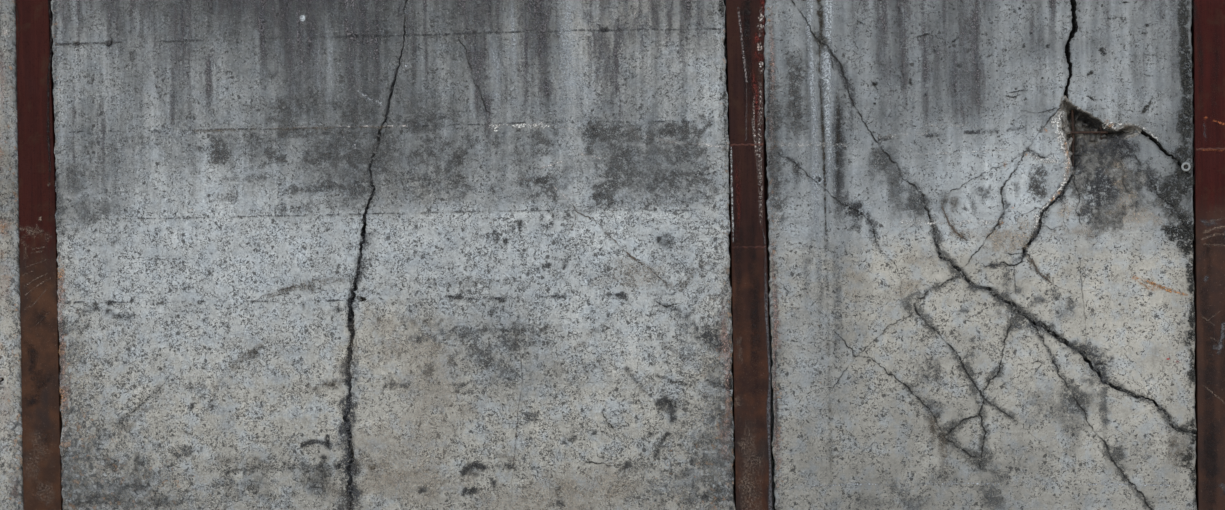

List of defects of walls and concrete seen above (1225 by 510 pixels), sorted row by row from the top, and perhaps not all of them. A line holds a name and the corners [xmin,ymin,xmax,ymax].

water stain [205,55,214,99]
crack [338,0,408,510]
water stain [458,0,703,133]
water stain [807,0,861,231]
water stain [877,0,986,126]
water stain [869,147,1027,249]
crack [779,0,1197,510]
spalling [1030,96,1158,234]